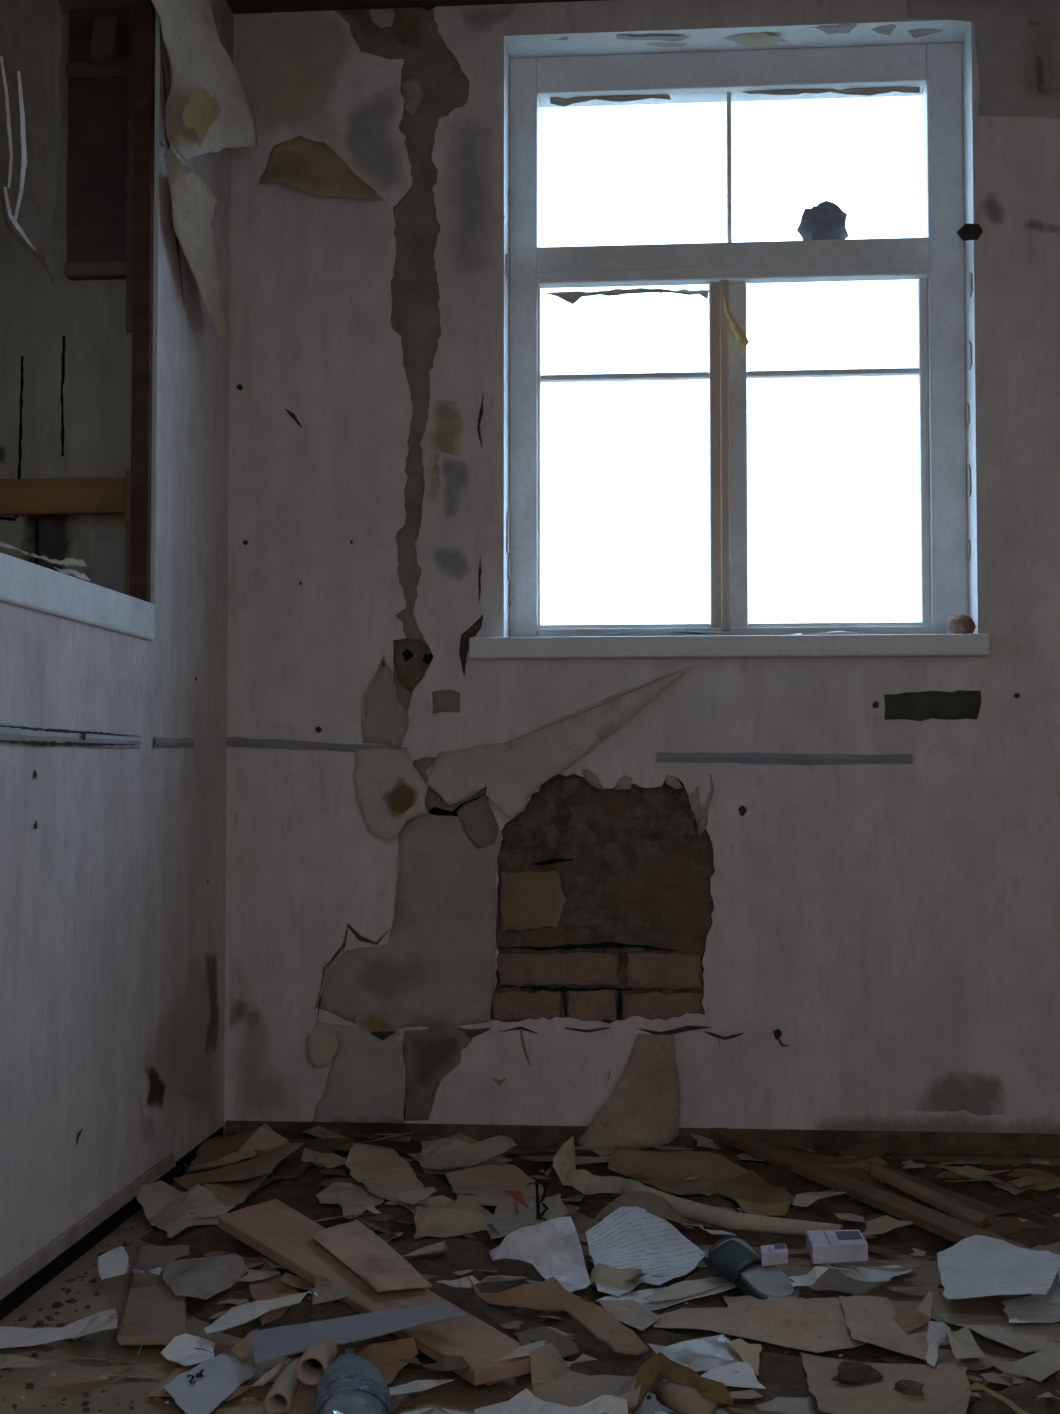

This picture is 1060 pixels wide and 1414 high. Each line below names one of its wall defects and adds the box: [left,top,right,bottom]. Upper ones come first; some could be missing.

flaking render [151,0,474,714]
flaking render [315,665,715,1152]